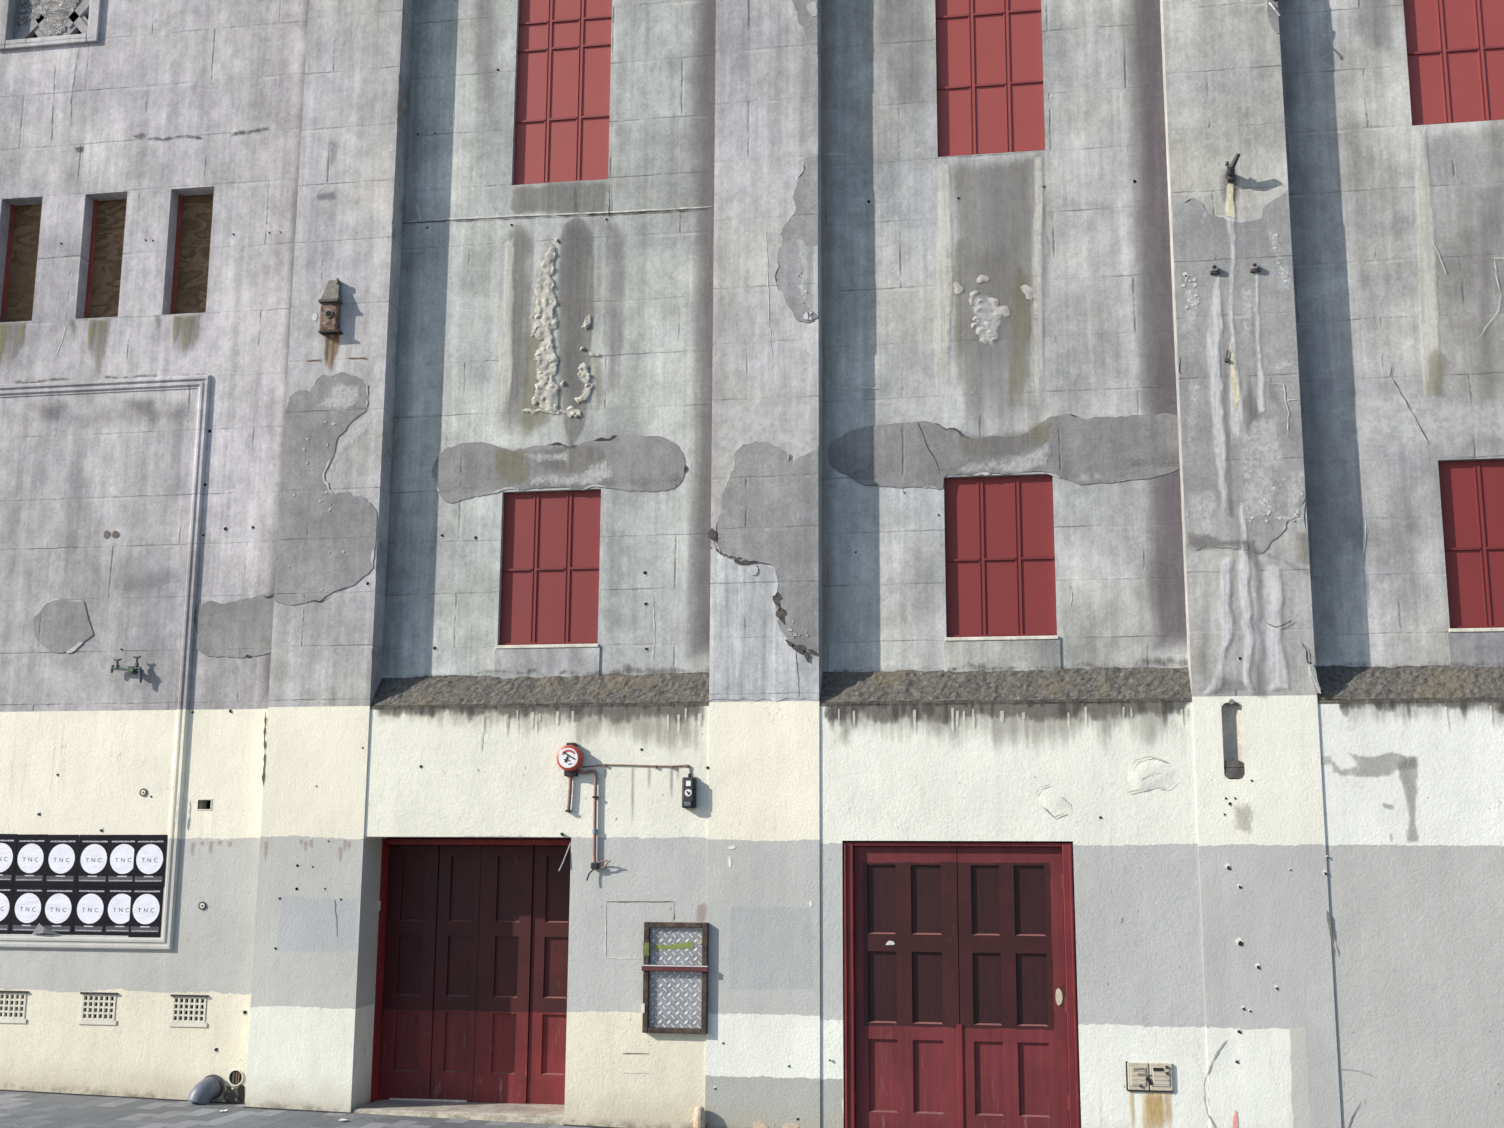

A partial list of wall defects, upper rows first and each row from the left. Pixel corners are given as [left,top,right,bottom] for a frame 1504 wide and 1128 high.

flaking render [792,0,818,55]
water stain [499,183,604,472]
flaking render [775,155,818,323]
water stain [935,164,1010,369]
water stain [1020,158,1042,390]
water stain [1207,184,1264,498]
flaking render [274,372,377,605]
flaking render [708,441,819,702]
water stain [1188,506,1287,695]
water stain [379,702,703,734]
water stain [1342,698,1504,729]
corrosion [1130,1092,1170,1126]